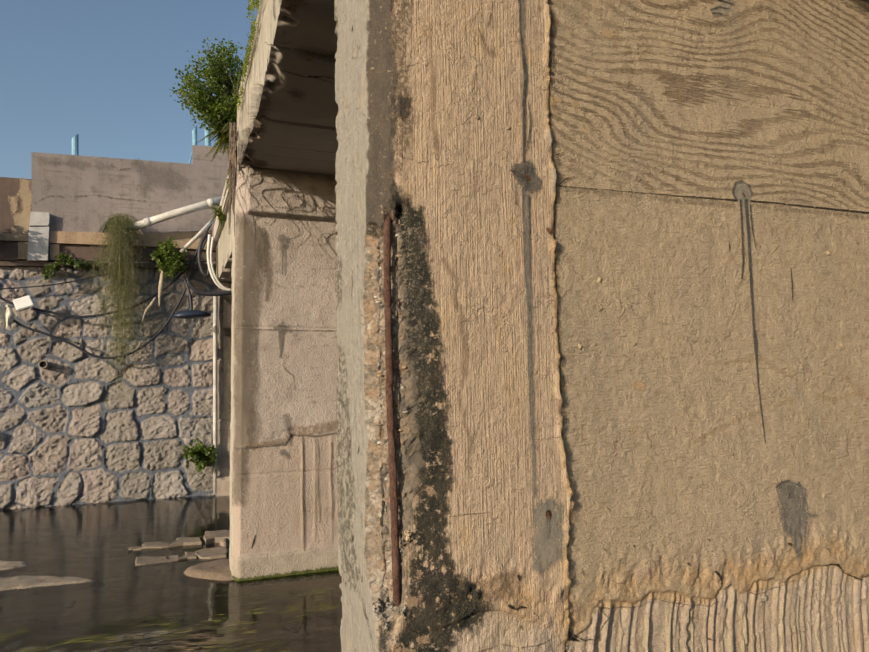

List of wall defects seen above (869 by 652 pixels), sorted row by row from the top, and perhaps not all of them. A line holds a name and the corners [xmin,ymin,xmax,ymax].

leakage [221,216,289,503]
leakage [276,323,292,358]
spalling [348,203,434,632]
leakage [365,0,491,652]
leakage [510,0,564,572]
crack [479,0,869,652]
leakage [732,180,766,443]
leakage [776,480,818,561]